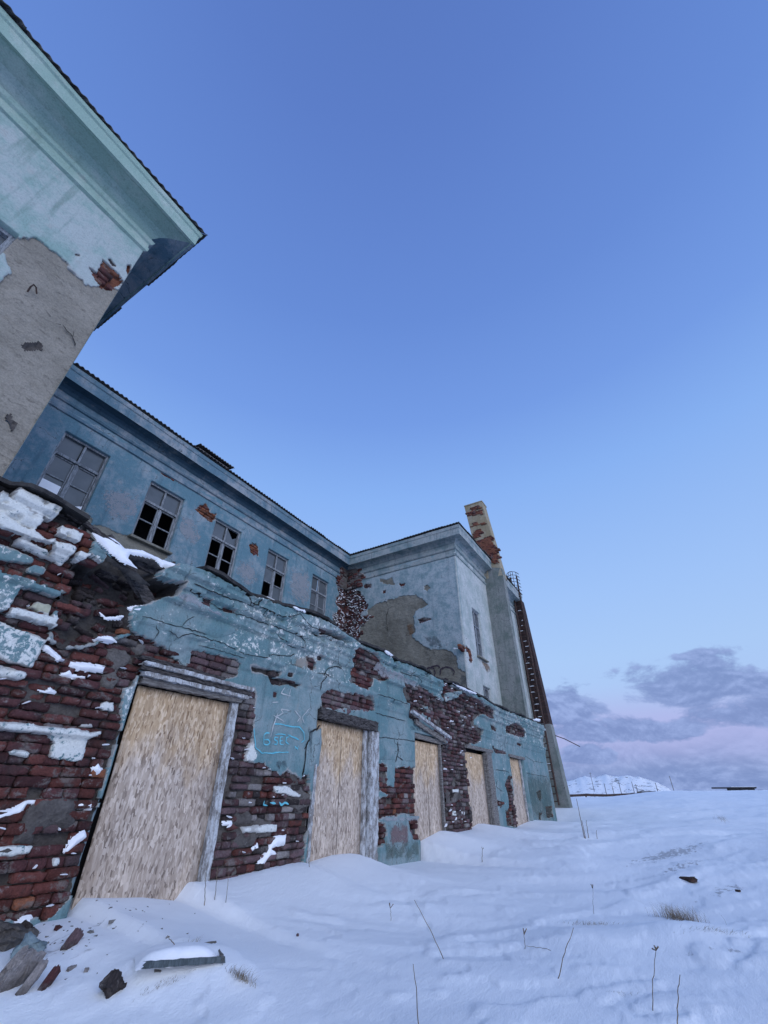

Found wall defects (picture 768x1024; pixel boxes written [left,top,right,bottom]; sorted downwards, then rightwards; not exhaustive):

flaking render [0,238,130,494]
spalling [195,504,216,522]
spalling [465,505,502,564]
crack [143,583,321,665]
spalling [0,513,311,921]
spalling [313,567,525,832]
spalling [377,763,419,847]